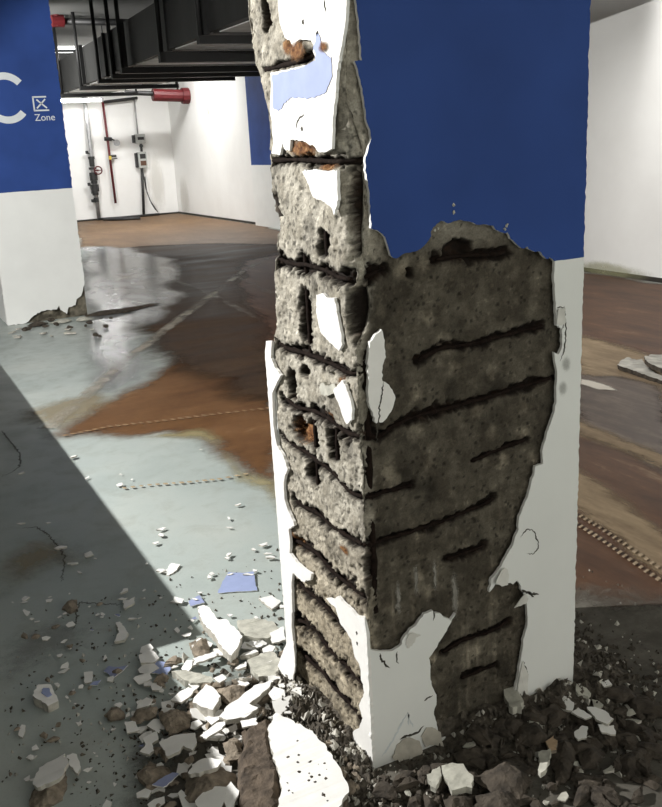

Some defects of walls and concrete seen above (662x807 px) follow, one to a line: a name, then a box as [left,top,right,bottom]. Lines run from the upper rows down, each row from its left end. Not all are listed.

corrosion [283,40,304,60]
corrosion [292,141,315,156]
spalling [27,287,88,334]
crack [557,306,567,359]
spalling [159,0,566,761]
corrosion [296,421,314,440]
crack [24,527,66,580]
crack [522,529,539,555]
flaking render [562,696,574,712]